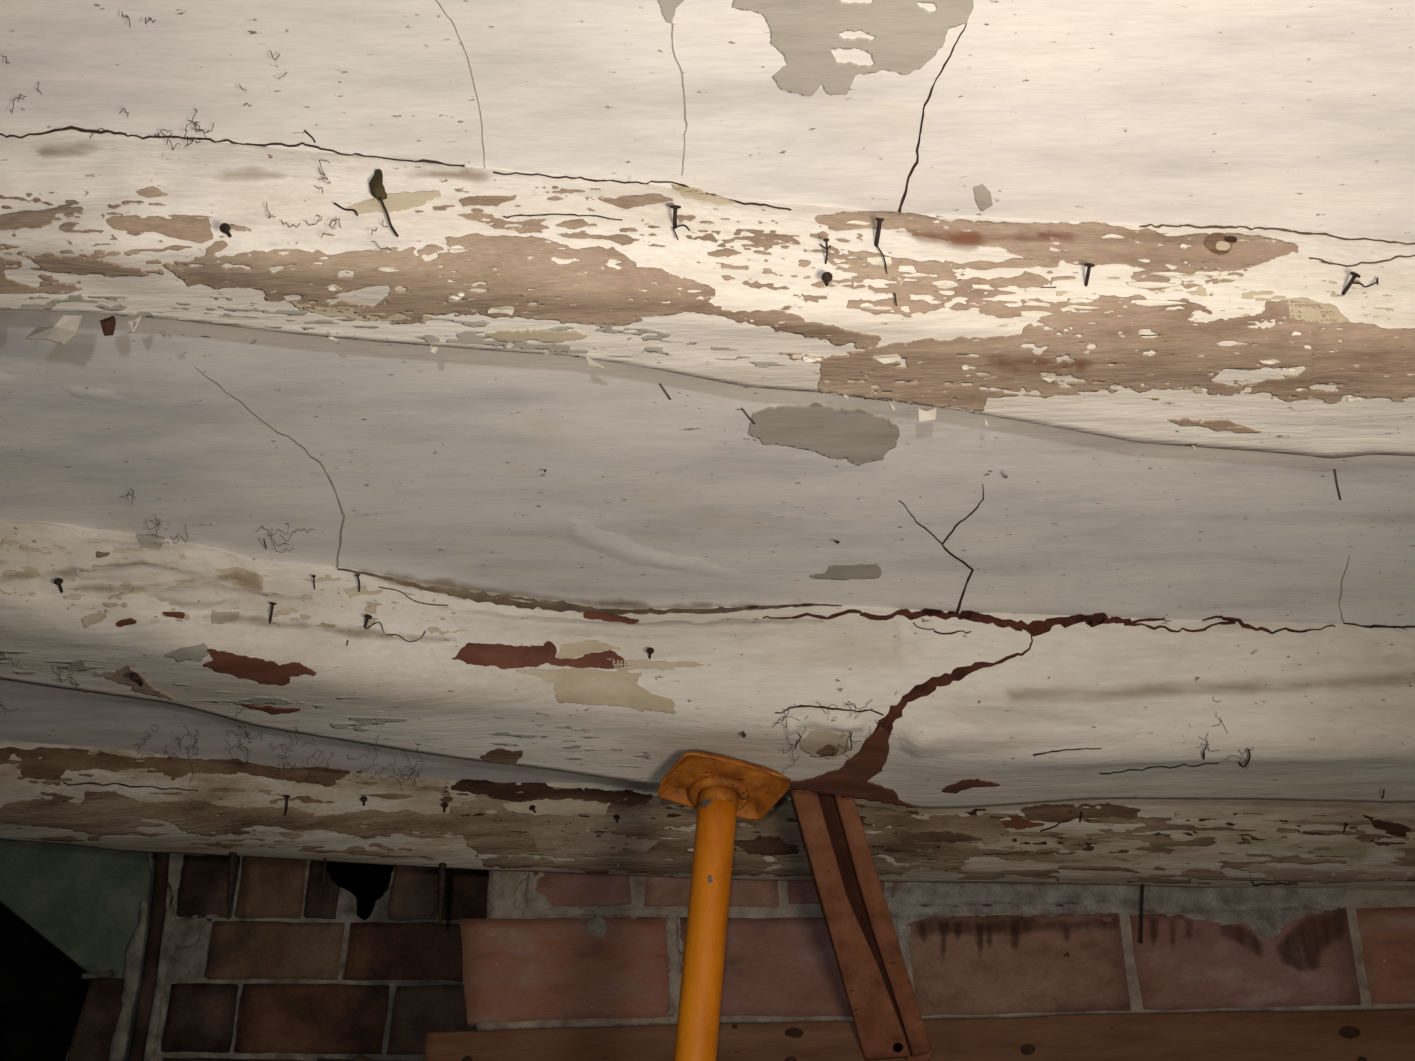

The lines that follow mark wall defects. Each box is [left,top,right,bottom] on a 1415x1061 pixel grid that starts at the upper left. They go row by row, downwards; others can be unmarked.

peeling [732,0,974,96]
crack [0,0,791,221]
crack [898,23,967,214]
peeling [0,183,1415,466]
crack [195,366,1415,751]
crack [63,782,199,791]
peeling [0,575,711,856]
flaking render [789,726,914,808]
peeling [991,804,1141,830]
crack [1033,748,1219,775]
hole [323,861,395,920]
damp [883,882,1346,967]